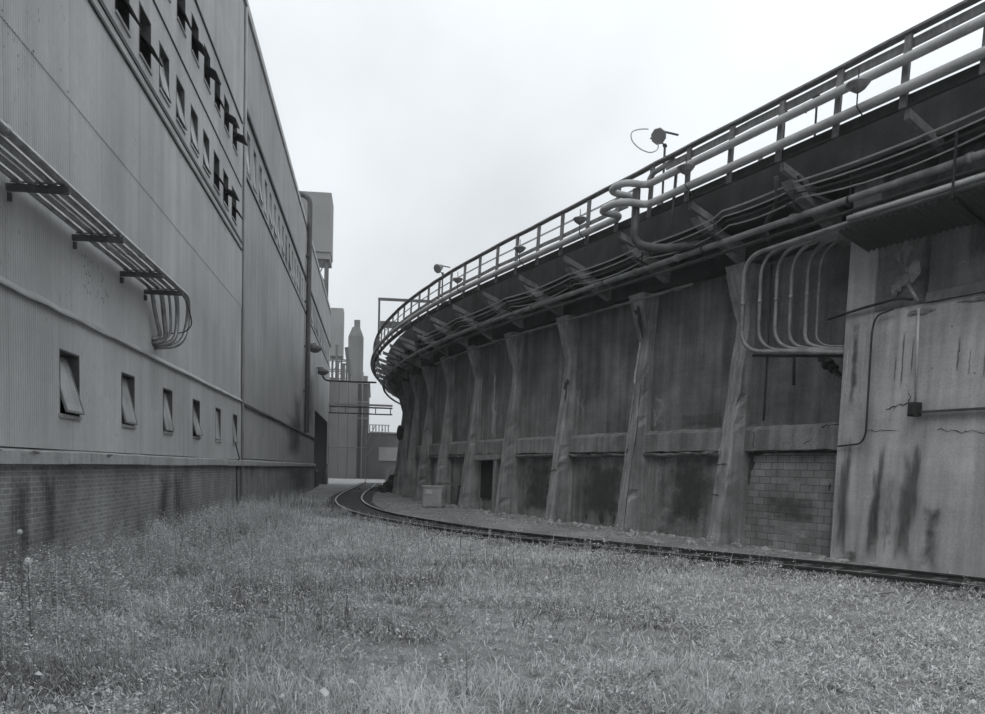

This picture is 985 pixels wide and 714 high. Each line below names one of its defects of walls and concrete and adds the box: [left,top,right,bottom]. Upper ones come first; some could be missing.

water stain [867,461,902,551]
water stain [925,512,938,557]